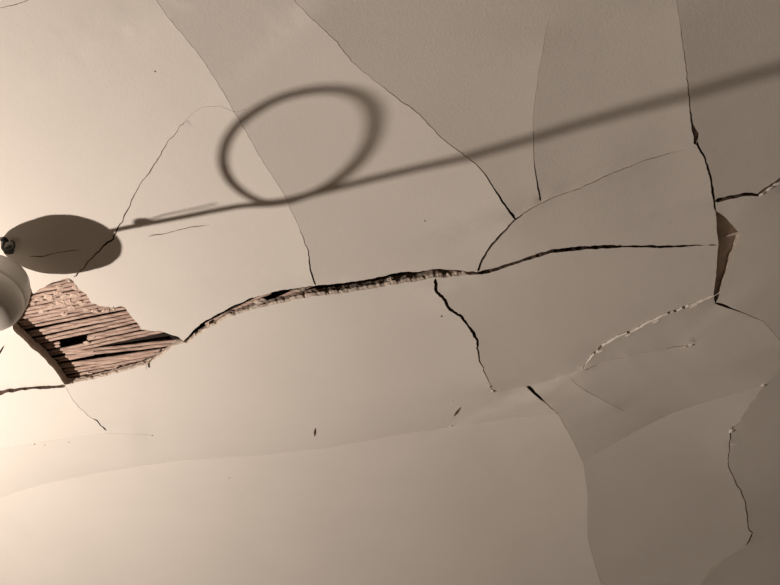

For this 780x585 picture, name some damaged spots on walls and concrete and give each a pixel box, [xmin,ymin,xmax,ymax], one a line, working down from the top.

crack [0,384,107,431]
spalling [13,278,197,385]
crack [29,106,212,277]
crack [157,0,780,492]
crack [701,373,776,585]